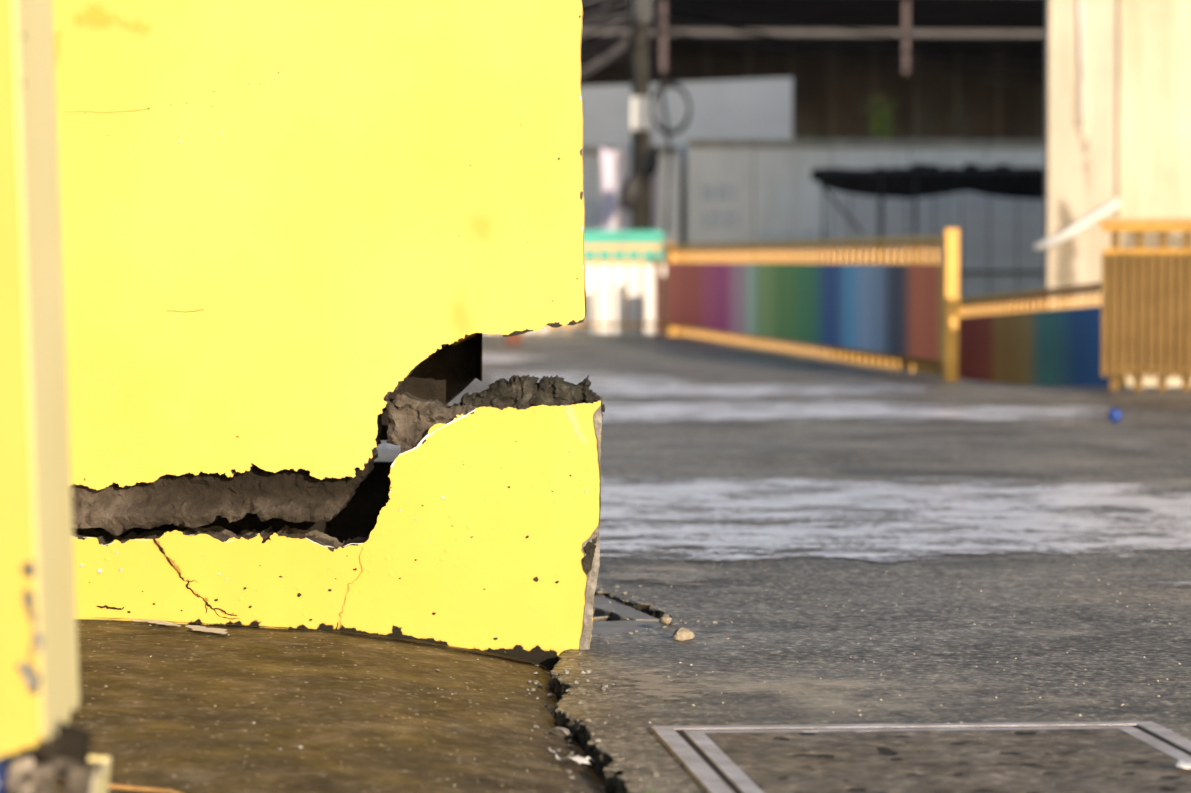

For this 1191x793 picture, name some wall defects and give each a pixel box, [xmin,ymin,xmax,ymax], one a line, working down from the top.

crack [71,453,378,630]
crack [7,720,92,793]